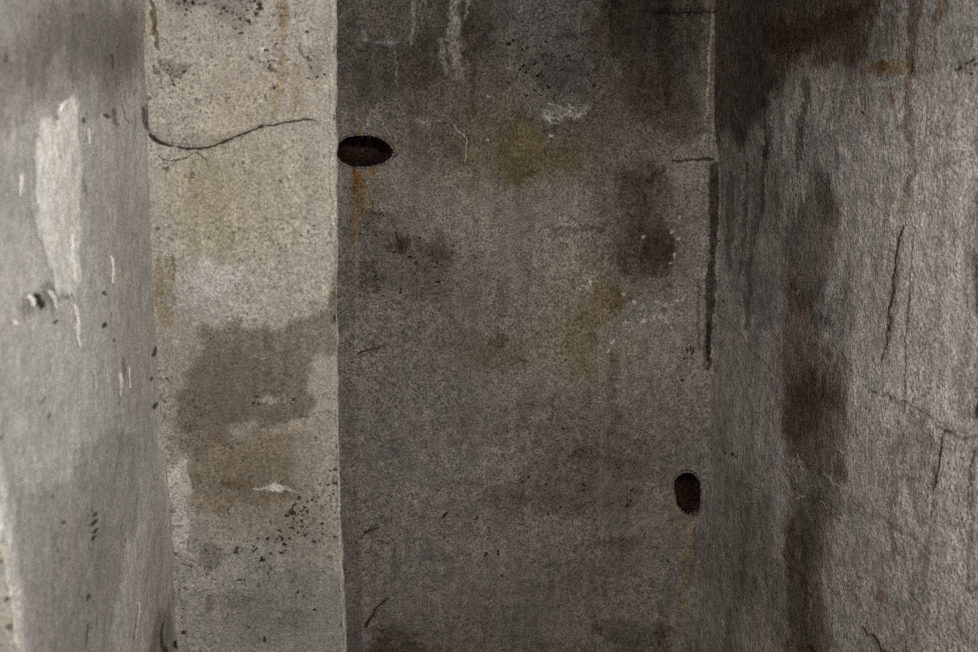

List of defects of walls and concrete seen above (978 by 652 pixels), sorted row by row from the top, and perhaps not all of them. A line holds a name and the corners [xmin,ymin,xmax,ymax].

crack [148,118,316,161]
leakage [605,293,691,353]
efflorescence [253,481,297,493]
leakage [779,451,858,527]